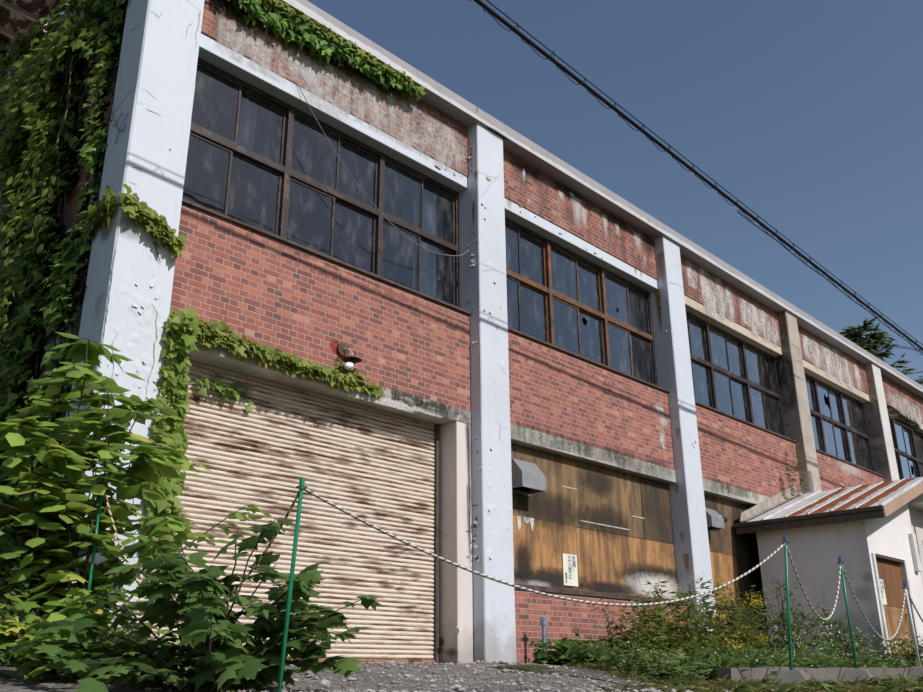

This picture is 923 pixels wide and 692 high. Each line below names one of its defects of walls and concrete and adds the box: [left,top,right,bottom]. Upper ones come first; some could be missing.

leakage [215,0,421,147]
leakage [427,121,464,167]
leakage [687,261,793,404]
leakage [803,335,861,389]
corrosion [787,478,914,517]